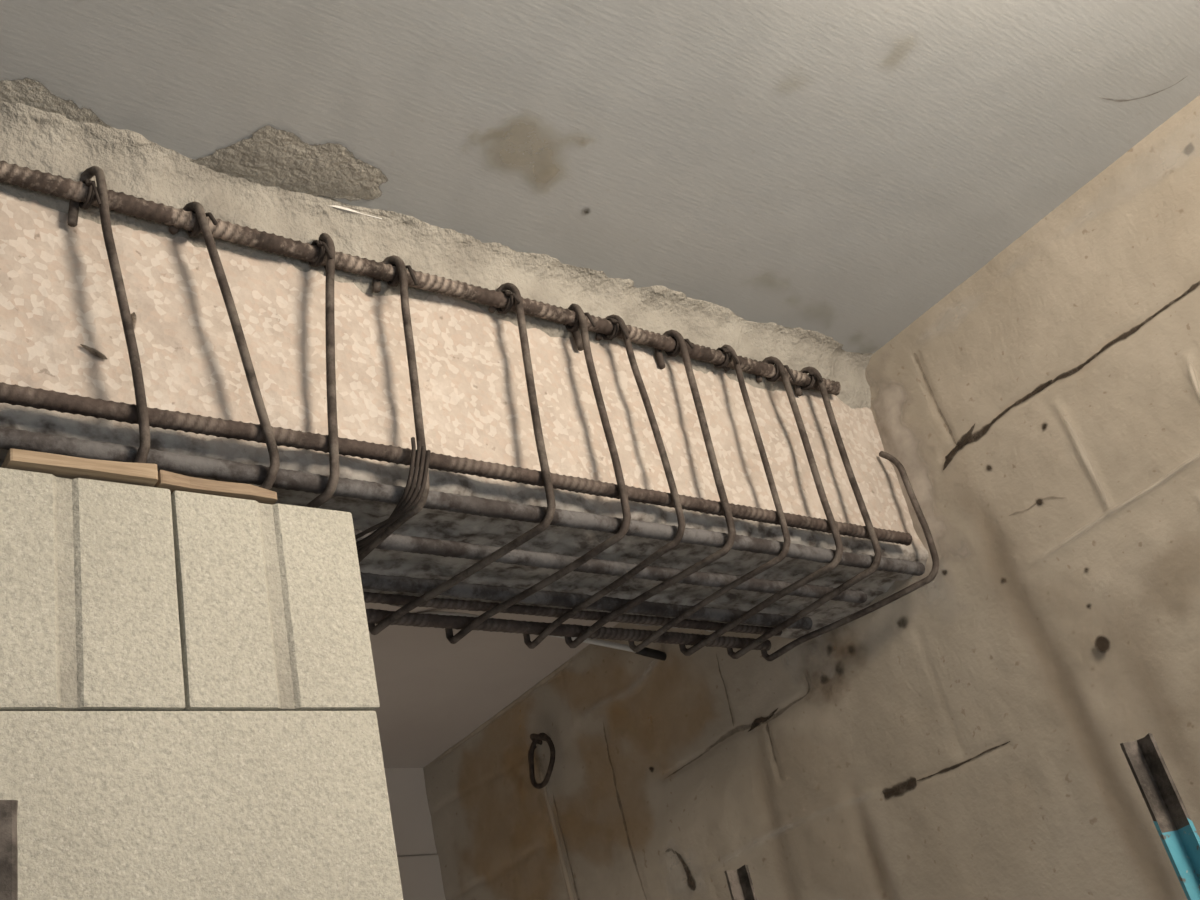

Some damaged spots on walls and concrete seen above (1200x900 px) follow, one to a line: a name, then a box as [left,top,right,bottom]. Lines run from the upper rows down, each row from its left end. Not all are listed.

flaking render [0,78,111,128]
flaking render [191,125,388,220]
spalling [80,344,107,360]
crack [940,281,1200,470]
crack [883,741,1010,799]